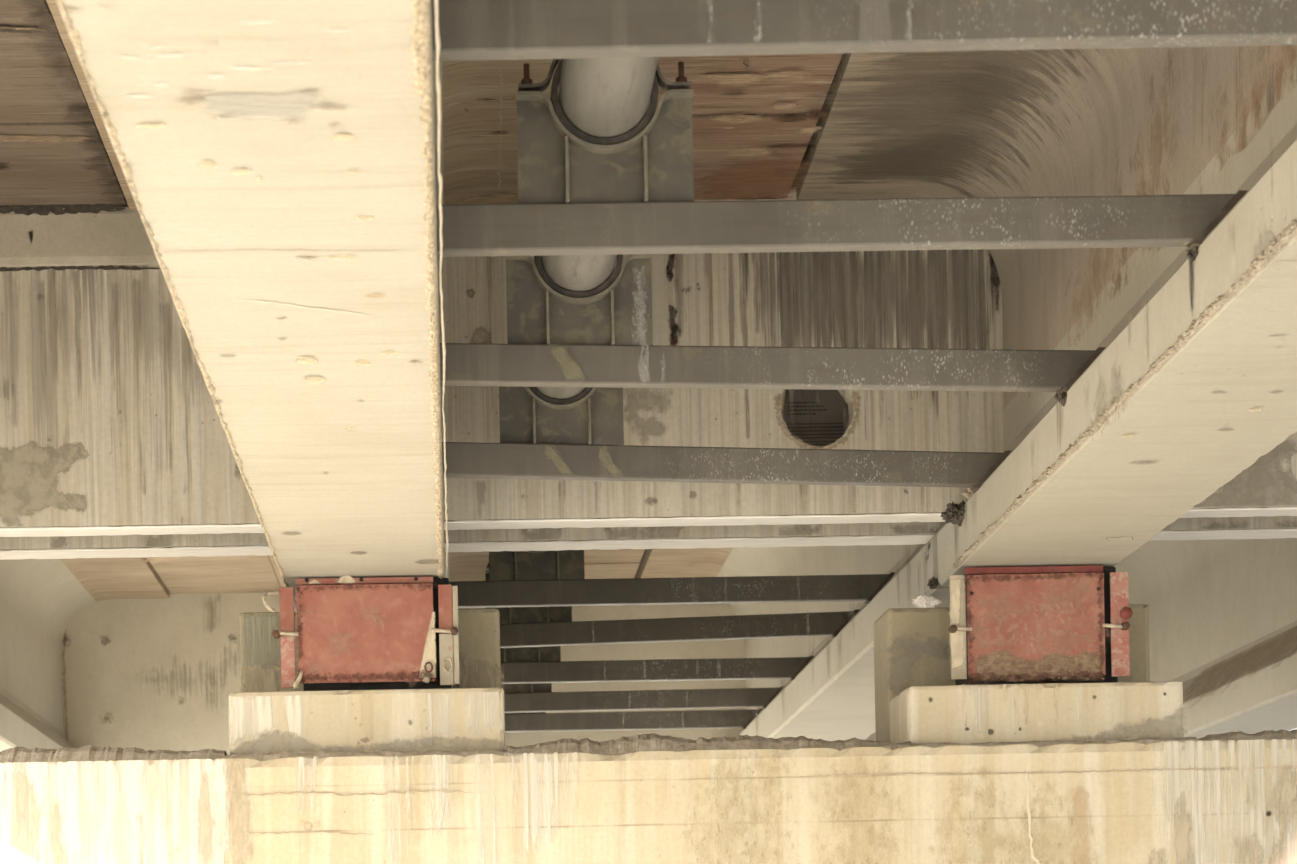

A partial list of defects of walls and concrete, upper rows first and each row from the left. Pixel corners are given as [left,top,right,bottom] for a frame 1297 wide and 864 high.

crack [0,264,161,272]
spalling [56,0,289,587]
damp [1198,441,1297,507]
rust [964,570,1105,682]
crack [792,763,1297,864]